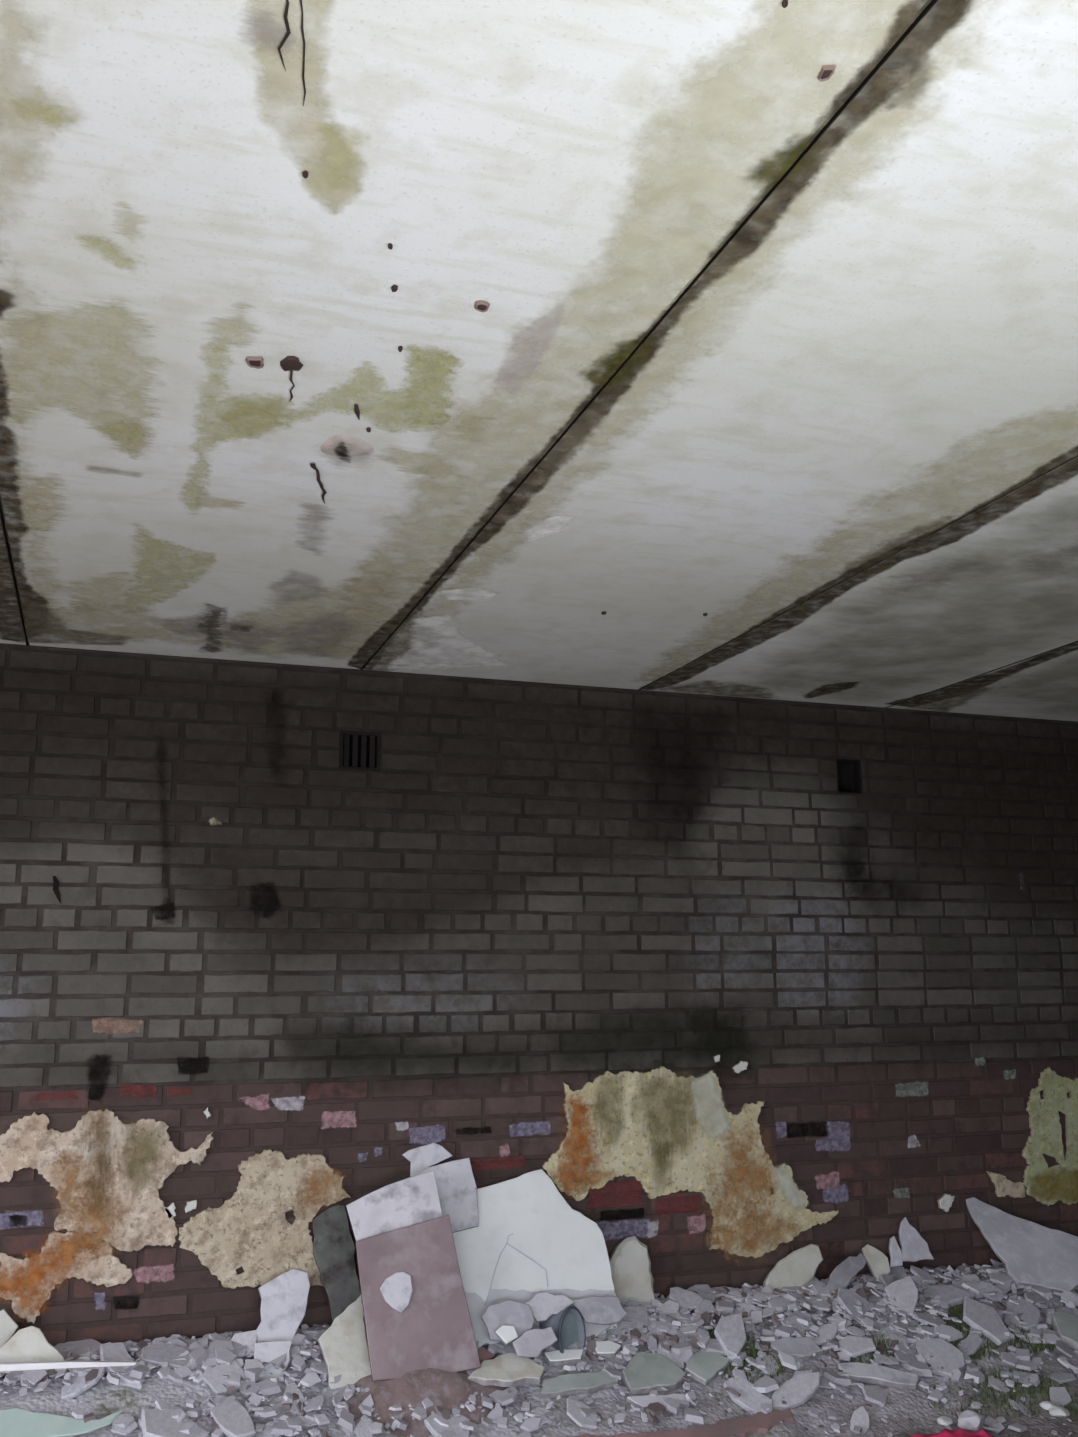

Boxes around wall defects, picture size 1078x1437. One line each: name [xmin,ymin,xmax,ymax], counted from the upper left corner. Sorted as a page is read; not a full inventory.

crack [278,0,306,106]
leakage [0,0,971,671]
leakage [640,415,1078,699]
leakage [887,642,1078,712]
corrosion [0,1156,122,1314]
peeling [0,1091,350,1324]
peeling [395,1122,491,1145]
peeling [473,1054,850,1259]
peeling [895,1081,928,1097]
peeling [937,1194,955,1212]
peeling [986,1067,1078,1206]